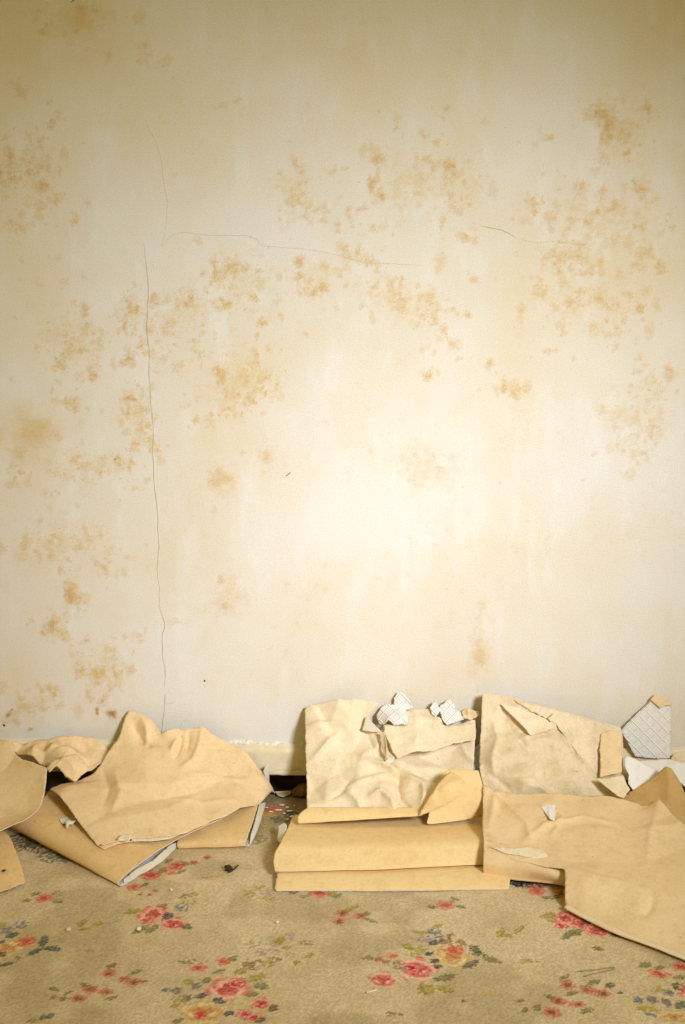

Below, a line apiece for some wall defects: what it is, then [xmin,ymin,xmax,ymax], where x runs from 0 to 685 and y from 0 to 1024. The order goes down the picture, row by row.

crack [144,131,412,733]